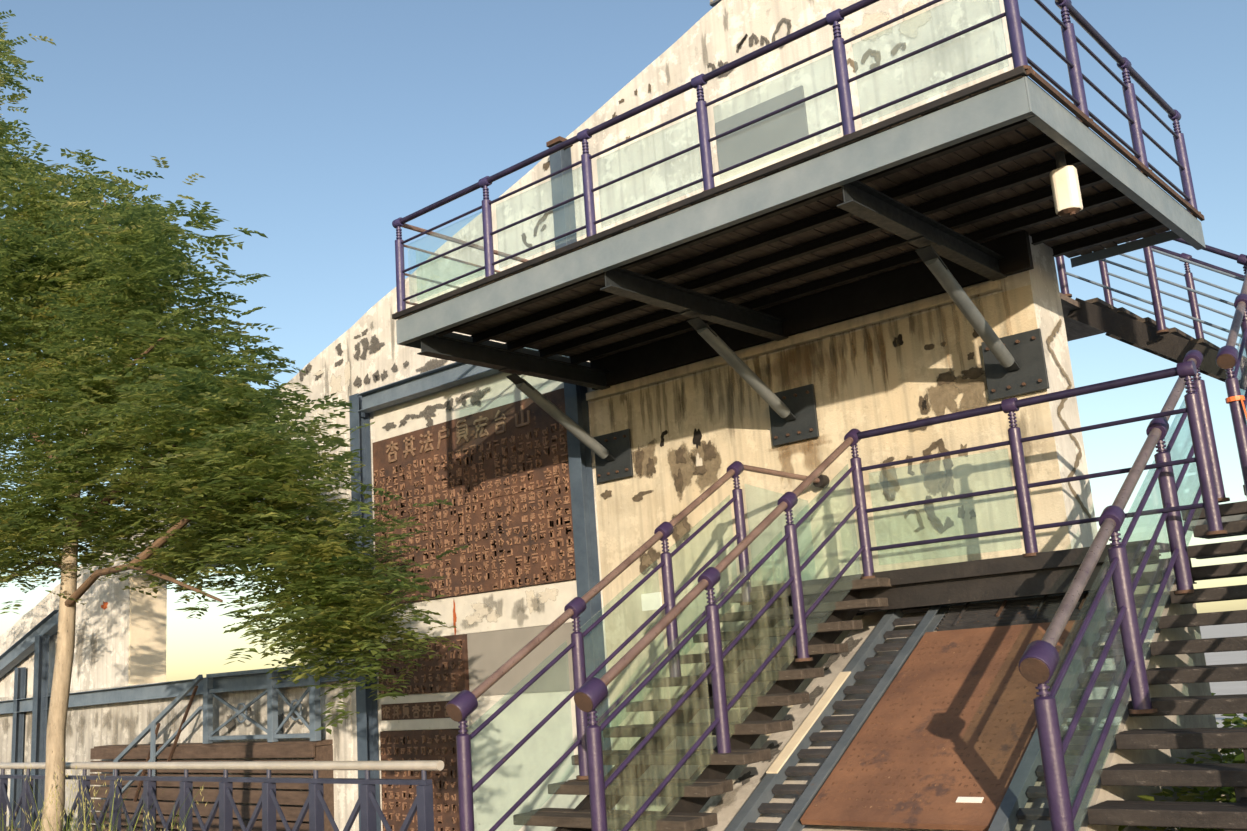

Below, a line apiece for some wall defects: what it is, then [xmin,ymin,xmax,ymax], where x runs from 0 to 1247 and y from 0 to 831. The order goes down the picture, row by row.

peeling [708,18,792,78]
peeling [299,329,447,395]
peeling [382,387,490,431]
spalling [632,428,721,502]
spalling [879,366,988,534]
peeling [639,547,660,575]
peeling [672,515,690,547]